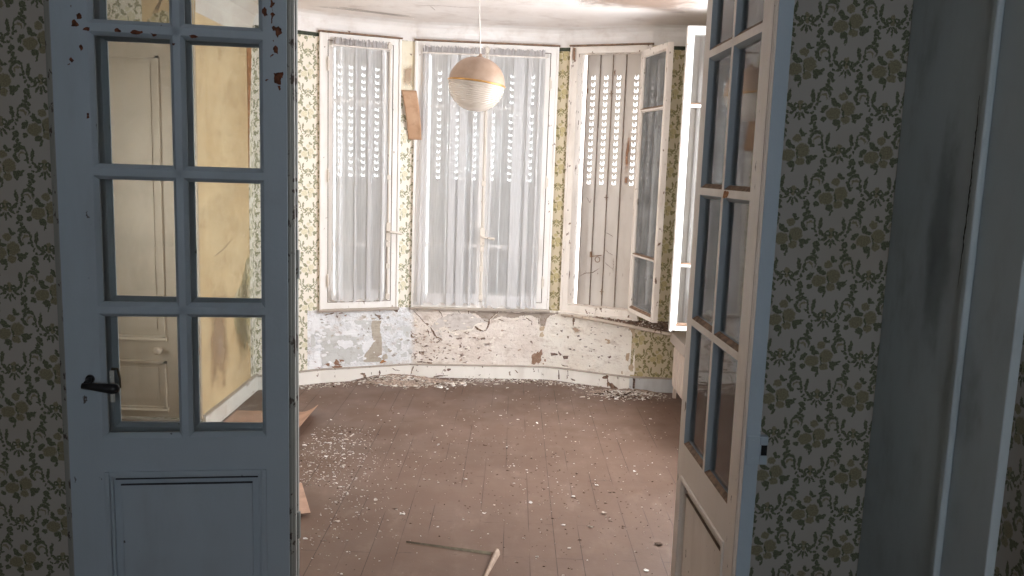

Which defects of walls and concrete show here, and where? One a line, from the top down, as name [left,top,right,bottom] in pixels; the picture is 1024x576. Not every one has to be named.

peeling [309,310,636,381]